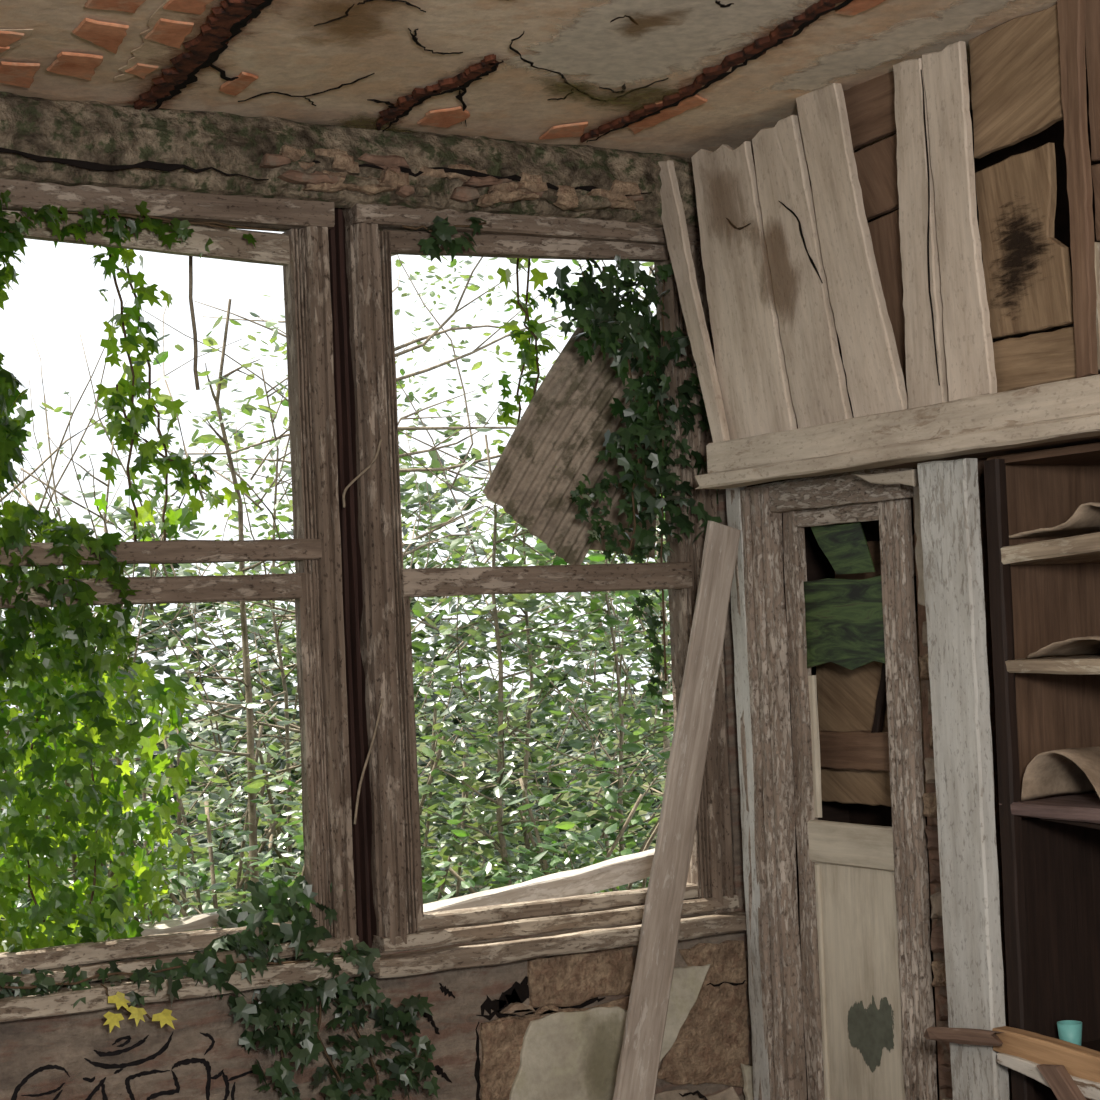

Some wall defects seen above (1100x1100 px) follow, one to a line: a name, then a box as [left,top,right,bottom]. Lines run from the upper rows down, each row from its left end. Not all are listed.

flaking render [0,0,146,88]
flaking render [114,0,216,82]
crack [126,0,853,143]
crack [0,147,269,180]
crack [359,164,521,181]
crack [547,183,599,191]
crack [707,979,746,987]
crack [679,1090,708,1100]